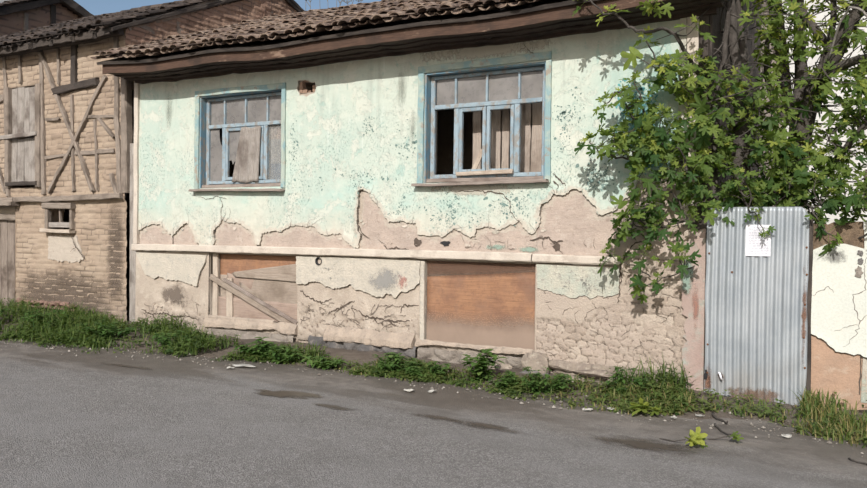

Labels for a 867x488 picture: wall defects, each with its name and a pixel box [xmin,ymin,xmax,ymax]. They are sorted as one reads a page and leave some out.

spalling [297,80,317,97]
spalling [48,234,85,263]
flaking render [135,163,693,373]
crack [835,250,867,347]
spalling [855,250,864,278]
flaking render [811,334,867,410]